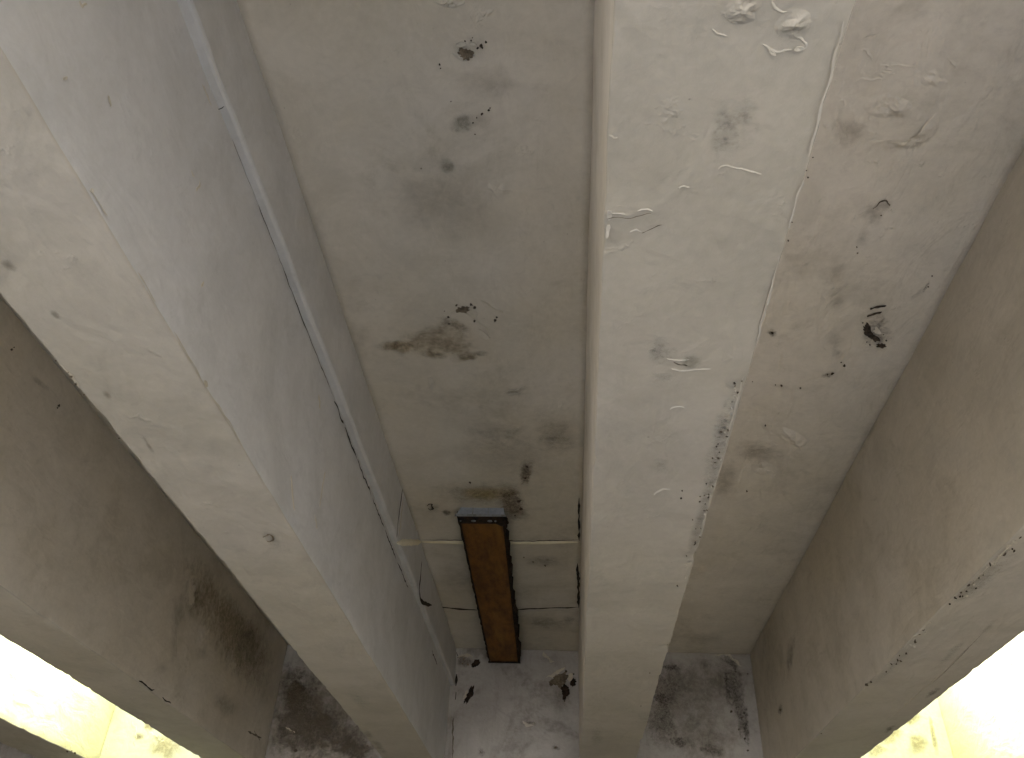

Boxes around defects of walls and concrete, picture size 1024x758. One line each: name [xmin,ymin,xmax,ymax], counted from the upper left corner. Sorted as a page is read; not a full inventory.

crack [232,139,478,614]
spalling [862,305,887,349]
crack [509,501,580,612]